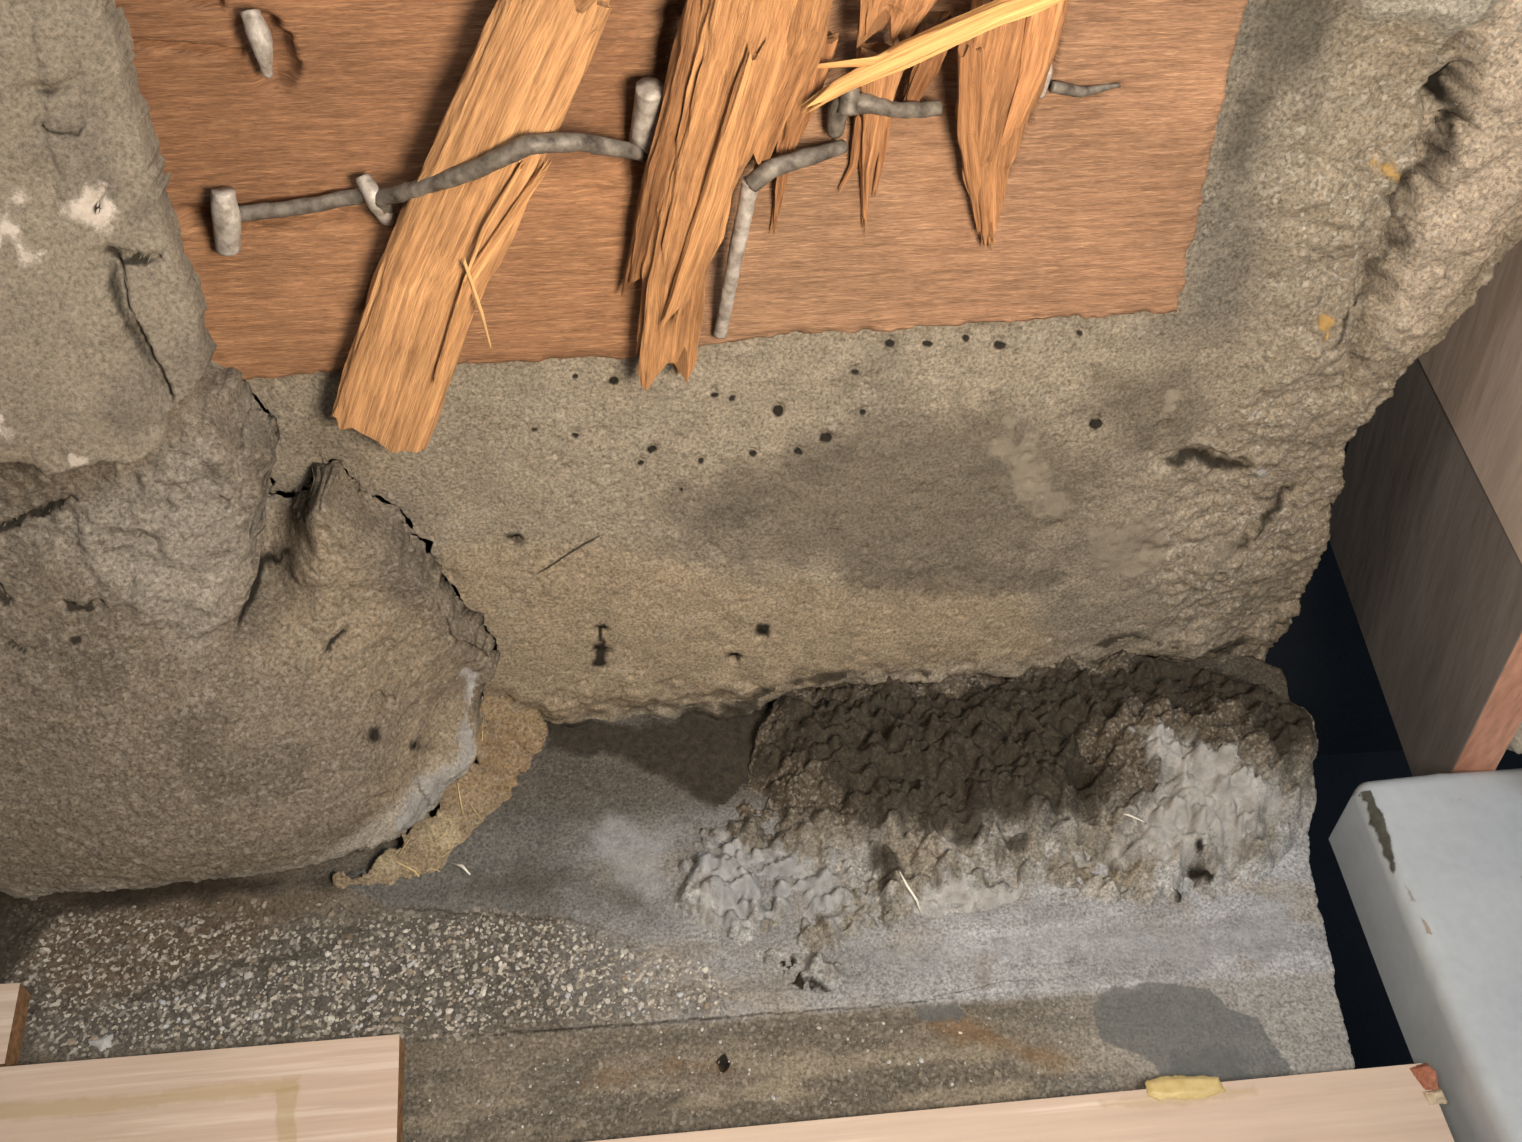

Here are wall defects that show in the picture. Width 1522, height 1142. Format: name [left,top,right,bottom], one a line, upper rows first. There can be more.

crack [1391,80,1462,194]
crack [108,247,153,353]
crack [1339,297,1358,341]
crack [0,496,70,532]
crack [238,549,289,624]
crack [325,629,345,652]
damp [545,633,1314,846]
damp [1110,723,1281,873]
damp [686,829,853,930]
damp [871,845,899,885]
damp [906,877,1023,915]
damp [1006,835,1027,852]